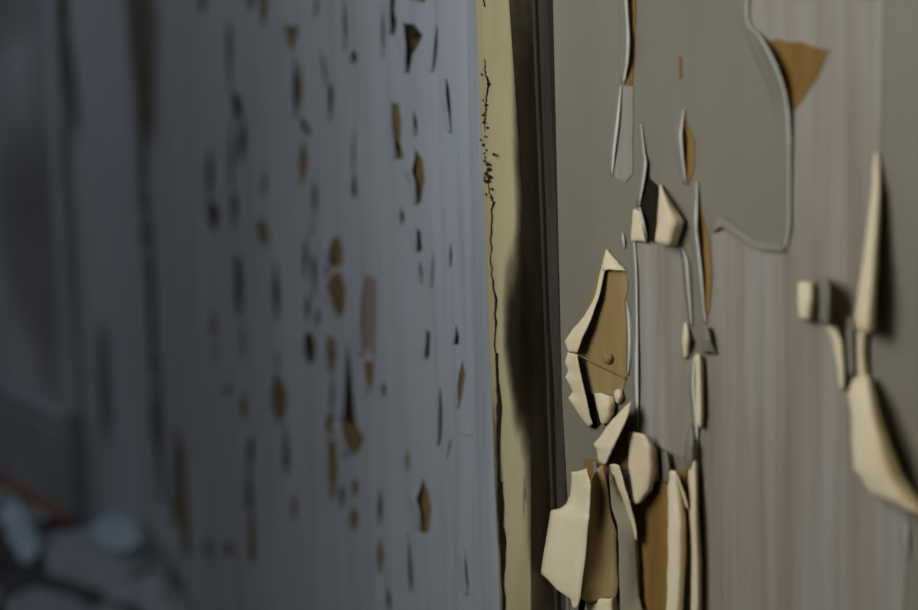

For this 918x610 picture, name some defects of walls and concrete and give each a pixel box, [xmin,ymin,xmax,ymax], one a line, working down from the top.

peeling [377,0,436,74]
peeling [202,17,246,232]
peeling [386,102,425,205]
peeling [442,79,451,133]
crack [482,59,490,130]
peeling [276,25,386,531]
peeling [396,207,434,288]
peeling [541,0,918,610]
peeling [264,349,290,476]
peeling [453,360,465,409]
crack [488,179,506,610]
peeling [404,478,431,591]